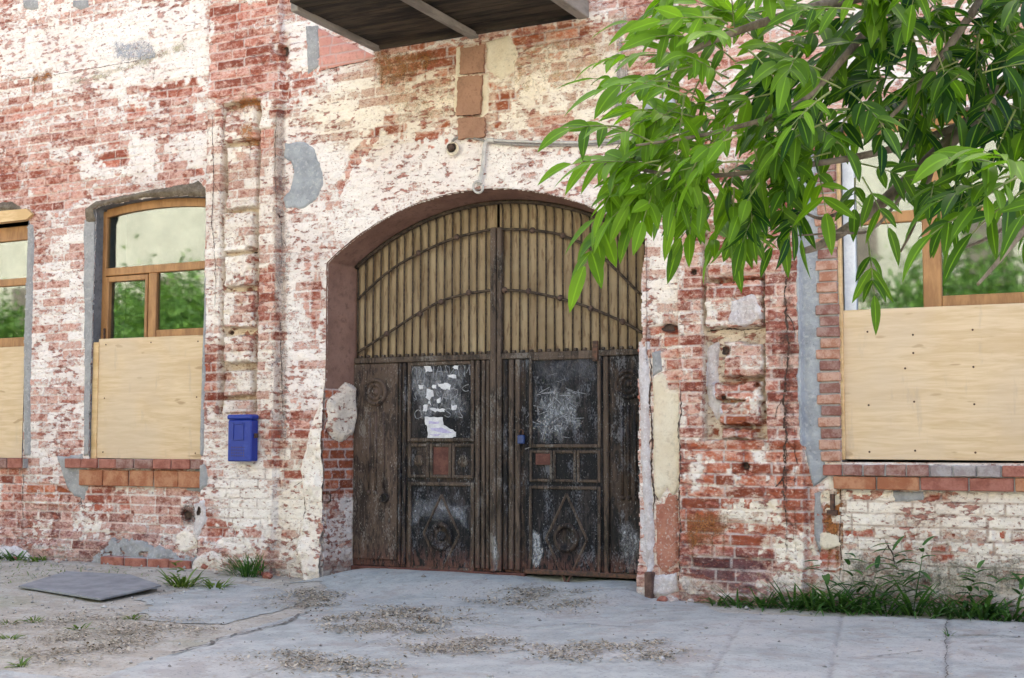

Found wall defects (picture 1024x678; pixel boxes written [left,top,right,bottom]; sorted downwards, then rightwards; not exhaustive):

peeling [0,0,327,222]
peeling [323,104,452,221]
spalling [371,38,465,91]
spalling [487,78,581,156]
peeling [184,398,323,559]
rust [687,513,727,557]
crack [774,273,798,545]
peeling [638,202,1024,607]